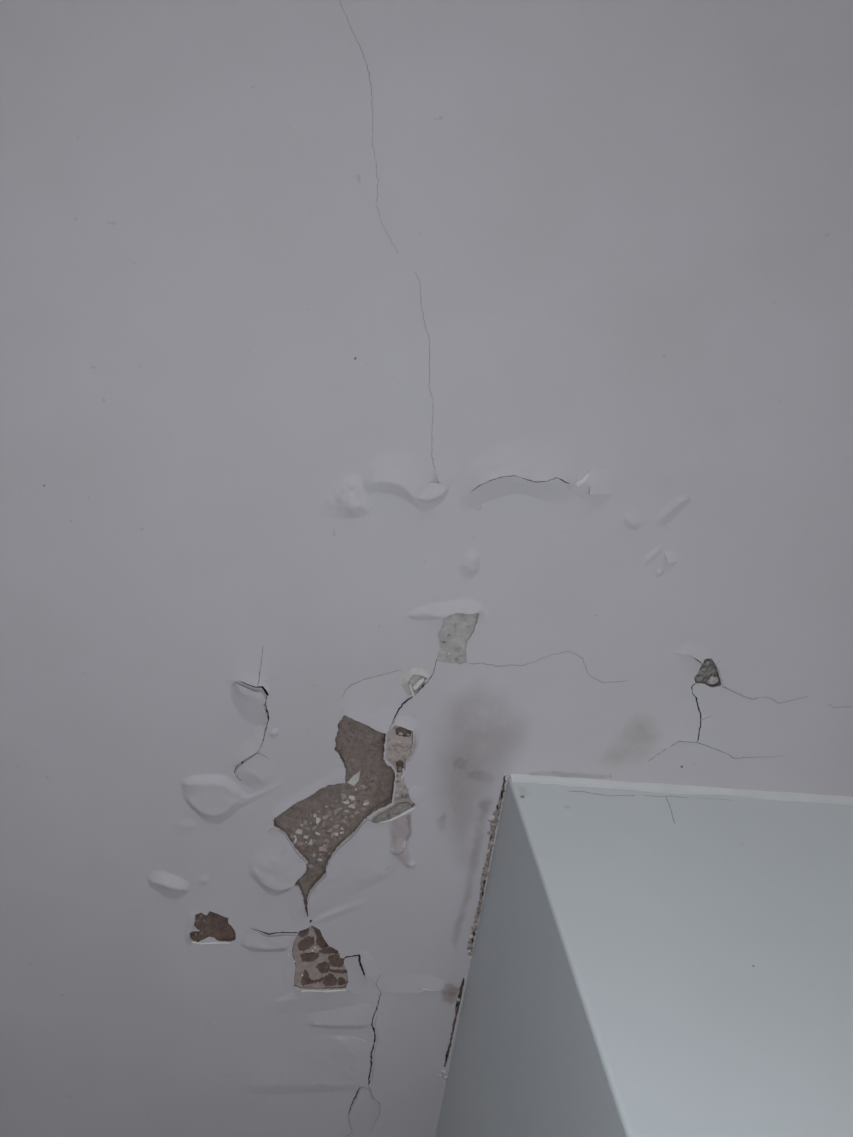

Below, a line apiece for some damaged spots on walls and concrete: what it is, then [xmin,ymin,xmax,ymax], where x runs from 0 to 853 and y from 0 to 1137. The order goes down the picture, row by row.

spalling [398,597,494,665]
spalling [673,643,773,699]
crack [645,683,778,761]
spalling [264,667,430,1015]
spalling [183,910,236,945]
crack [344,949,382,1137]